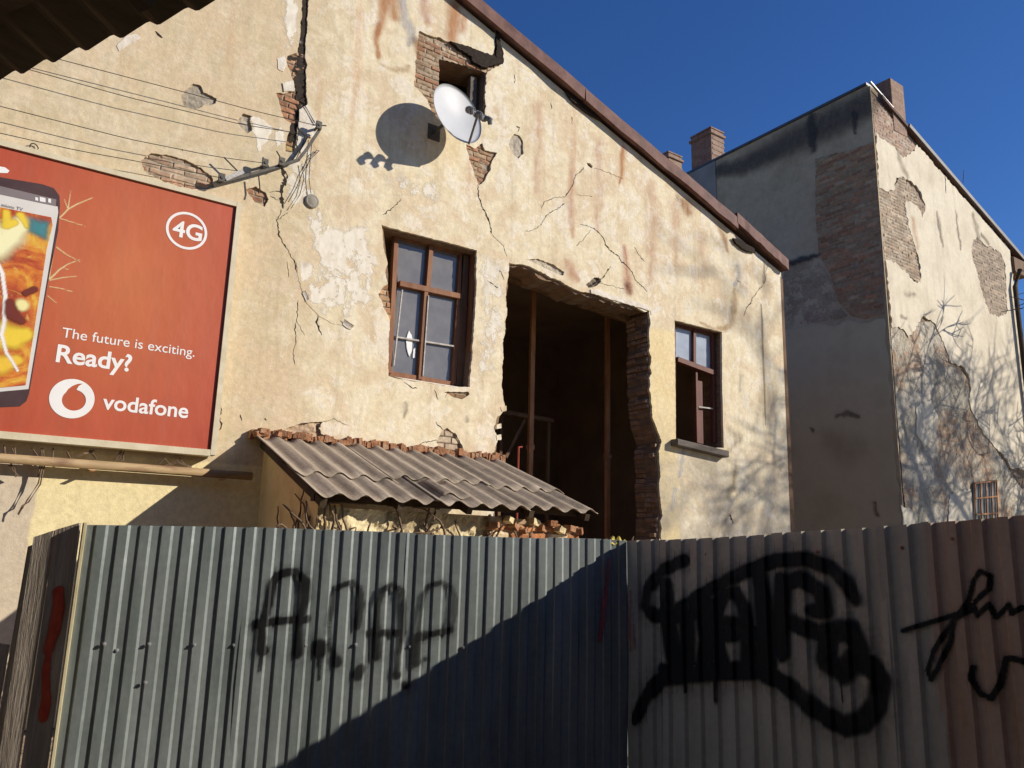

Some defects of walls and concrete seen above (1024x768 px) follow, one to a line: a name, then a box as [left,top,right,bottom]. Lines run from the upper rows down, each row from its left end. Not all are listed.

corrosion [375,0,397,57]
flaking render [181,85,216,110]
flaking render [414,32,503,121]
flaking render [141,150,213,190]
crack [271,167,297,277]
flaking render [466,144,496,185]
crack [477,186,507,288]
crack [525,167,623,232]
crack [580,224,646,290]
flaking render [815,105,925,319]
flaking render [971,238,1009,317]
crack [293,303,322,363]